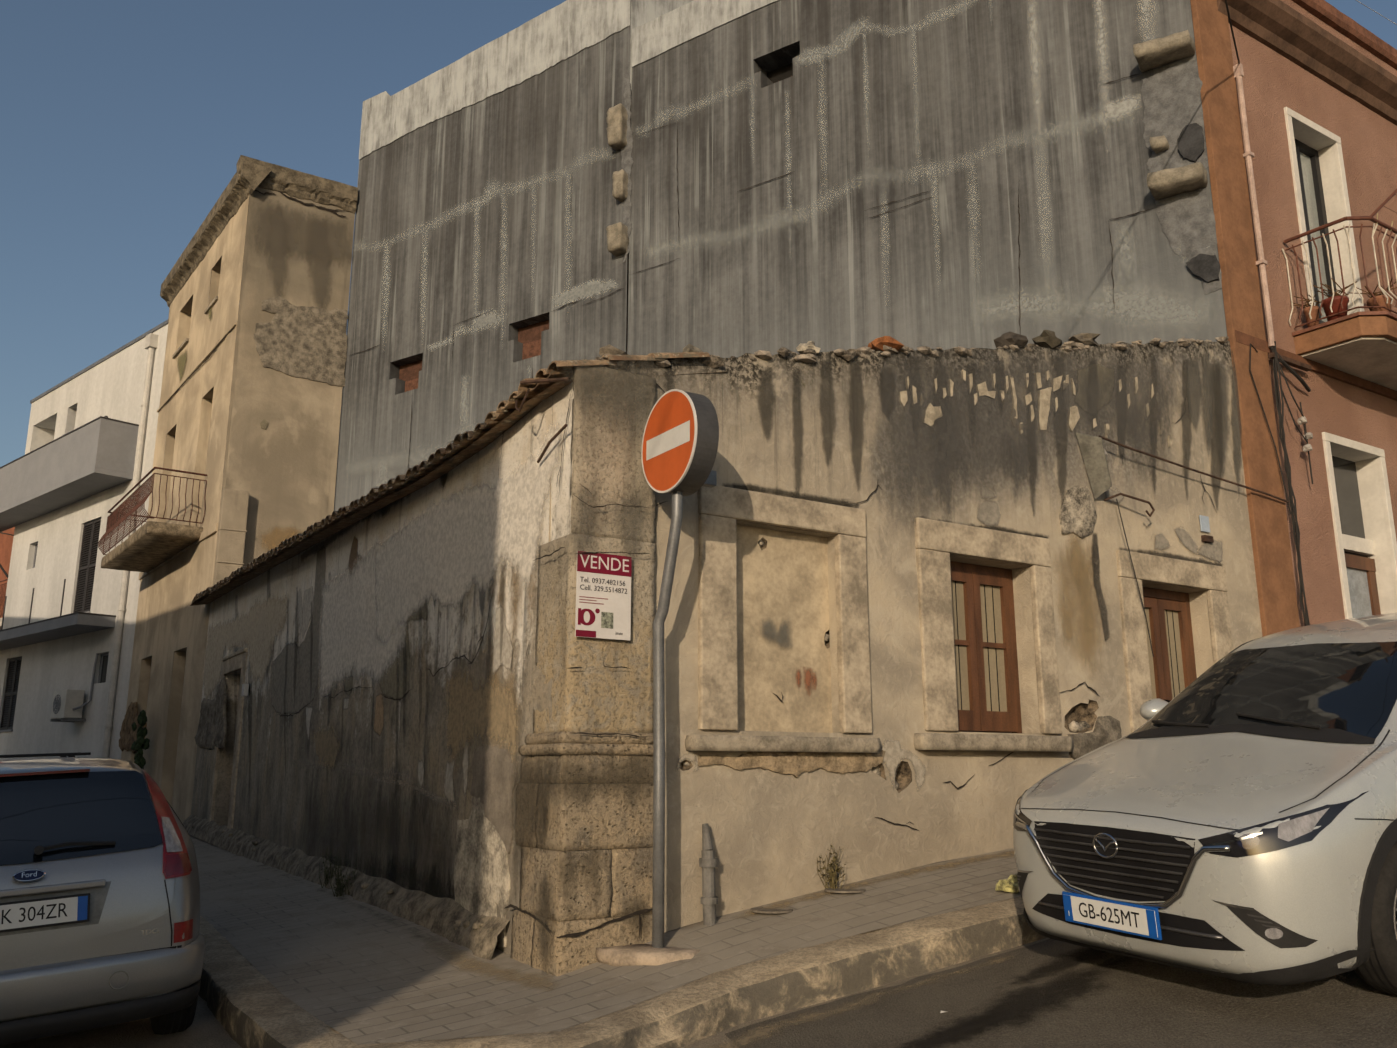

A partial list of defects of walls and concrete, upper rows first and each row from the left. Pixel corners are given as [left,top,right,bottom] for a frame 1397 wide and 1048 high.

flaking render [1141,60,1209,173]
water stain [256,206,351,308]
water stain [554,281,616,306]
flaking render [1152,188,1222,295]
water stain [723,370,858,507]
water stain [820,361,864,484]
water stain [880,358,945,416]
water stain [1056,410,1067,499]
water stain [1182,354,1242,506]
flaking render [194,677,227,750]
peeling [378,602,428,746]
spalling [1064,699,1099,733]